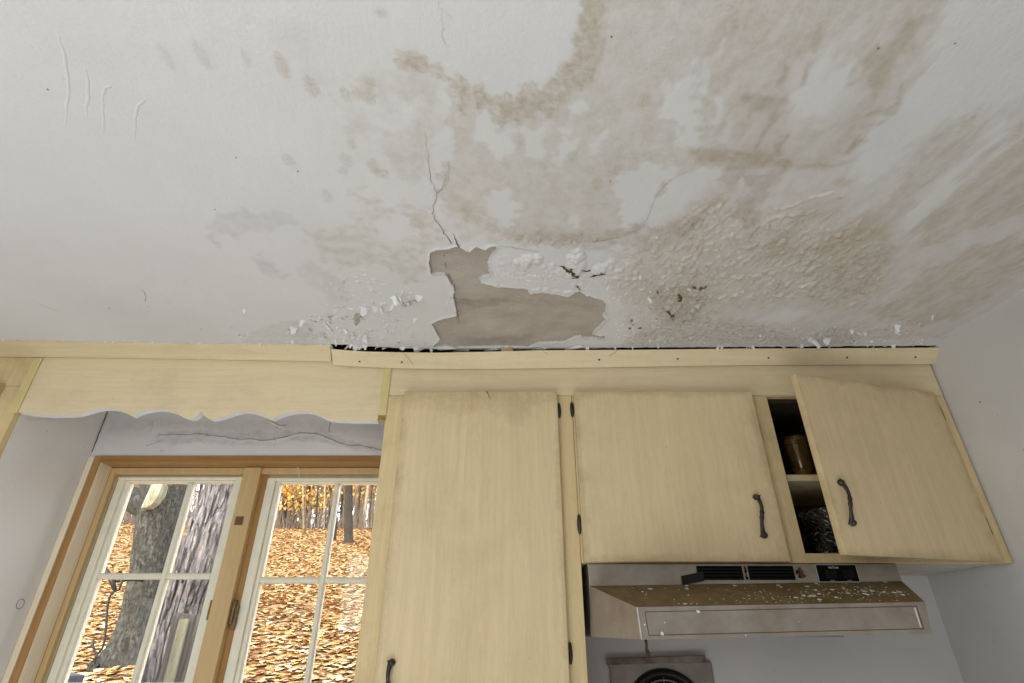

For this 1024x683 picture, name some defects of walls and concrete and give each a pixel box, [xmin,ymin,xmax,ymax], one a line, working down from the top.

crack [425,134,460,266]
peeling [230,243,938,353]
crack [147,422,382,454]